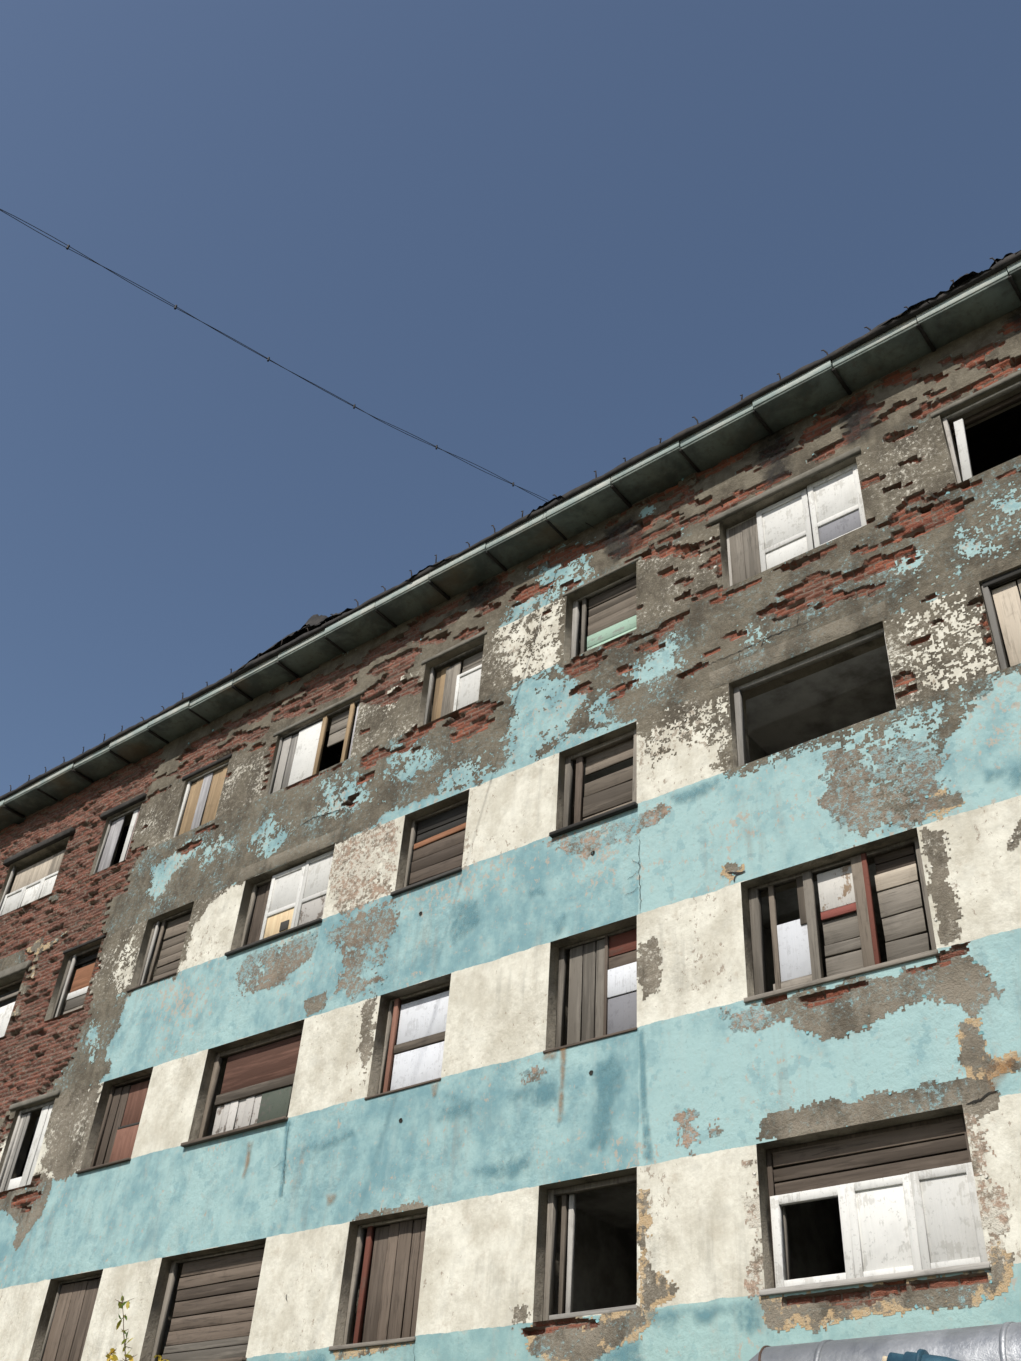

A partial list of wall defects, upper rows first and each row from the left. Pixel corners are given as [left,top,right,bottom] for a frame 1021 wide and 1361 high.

peeling [0,308,1021,1334]
peeling [509,1189,679,1361]